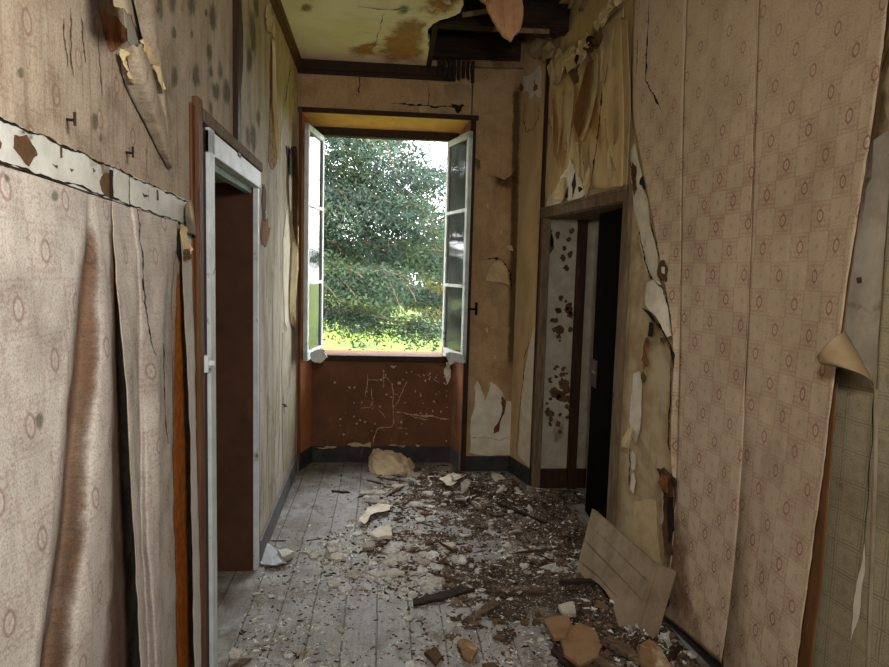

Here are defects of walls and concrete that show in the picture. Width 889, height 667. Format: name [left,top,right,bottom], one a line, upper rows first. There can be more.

flaking render [99,0,142,51]
water stain [208,46,230,114]
water stain [247,0,259,71]
water stain [351,7,425,61]
crack [392,91,464,113]
crack [636,9,661,110]
peeling [13,135,38,166]
peeling [93,168,114,199]
crack [0,117,188,437]
crack [361,373,450,443]
flaking render [470,328,535,467]
flaking render [628,337,676,565]